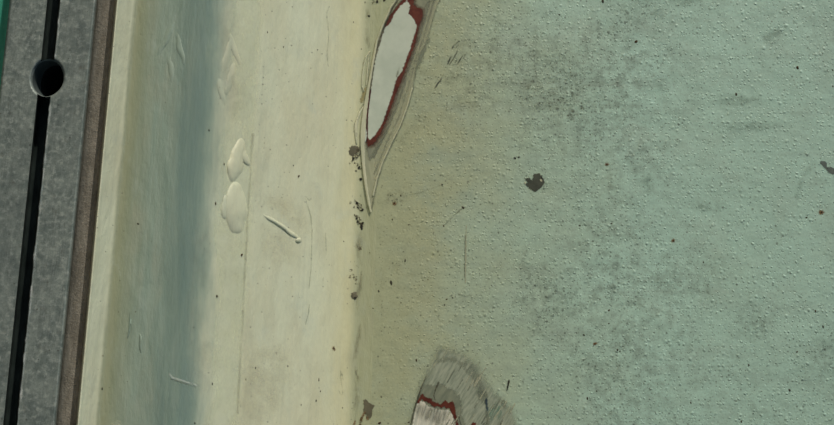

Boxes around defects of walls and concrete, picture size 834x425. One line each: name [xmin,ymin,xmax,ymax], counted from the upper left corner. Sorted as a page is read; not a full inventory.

peeling [349,0,439,213]
peeling [410,348,515,425]